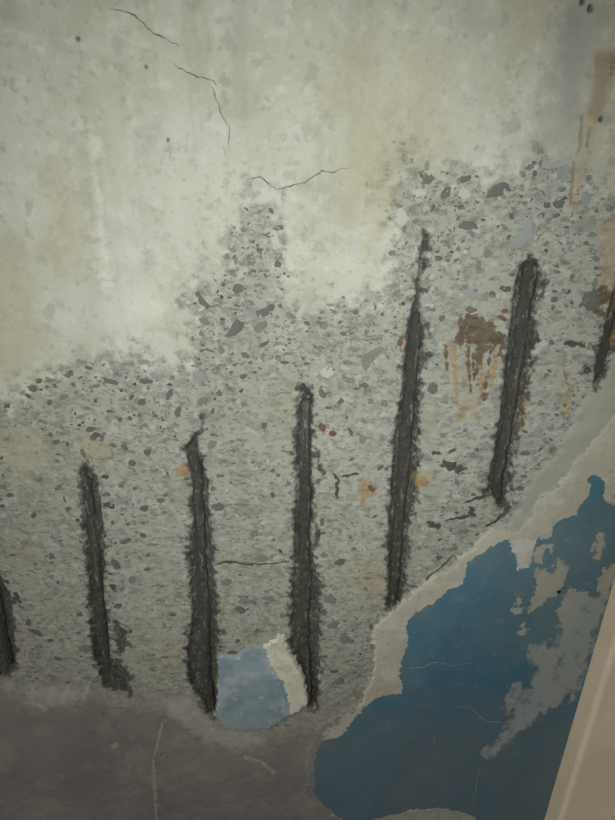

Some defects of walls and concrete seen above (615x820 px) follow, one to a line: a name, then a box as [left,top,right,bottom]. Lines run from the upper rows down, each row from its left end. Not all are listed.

crack [111,9,177,44]
crack [174,64,230,152]
crack [251,168,349,190]
rust [444,313,507,401]
spalling [0,126,615,752]
crack [215,559,290,567]